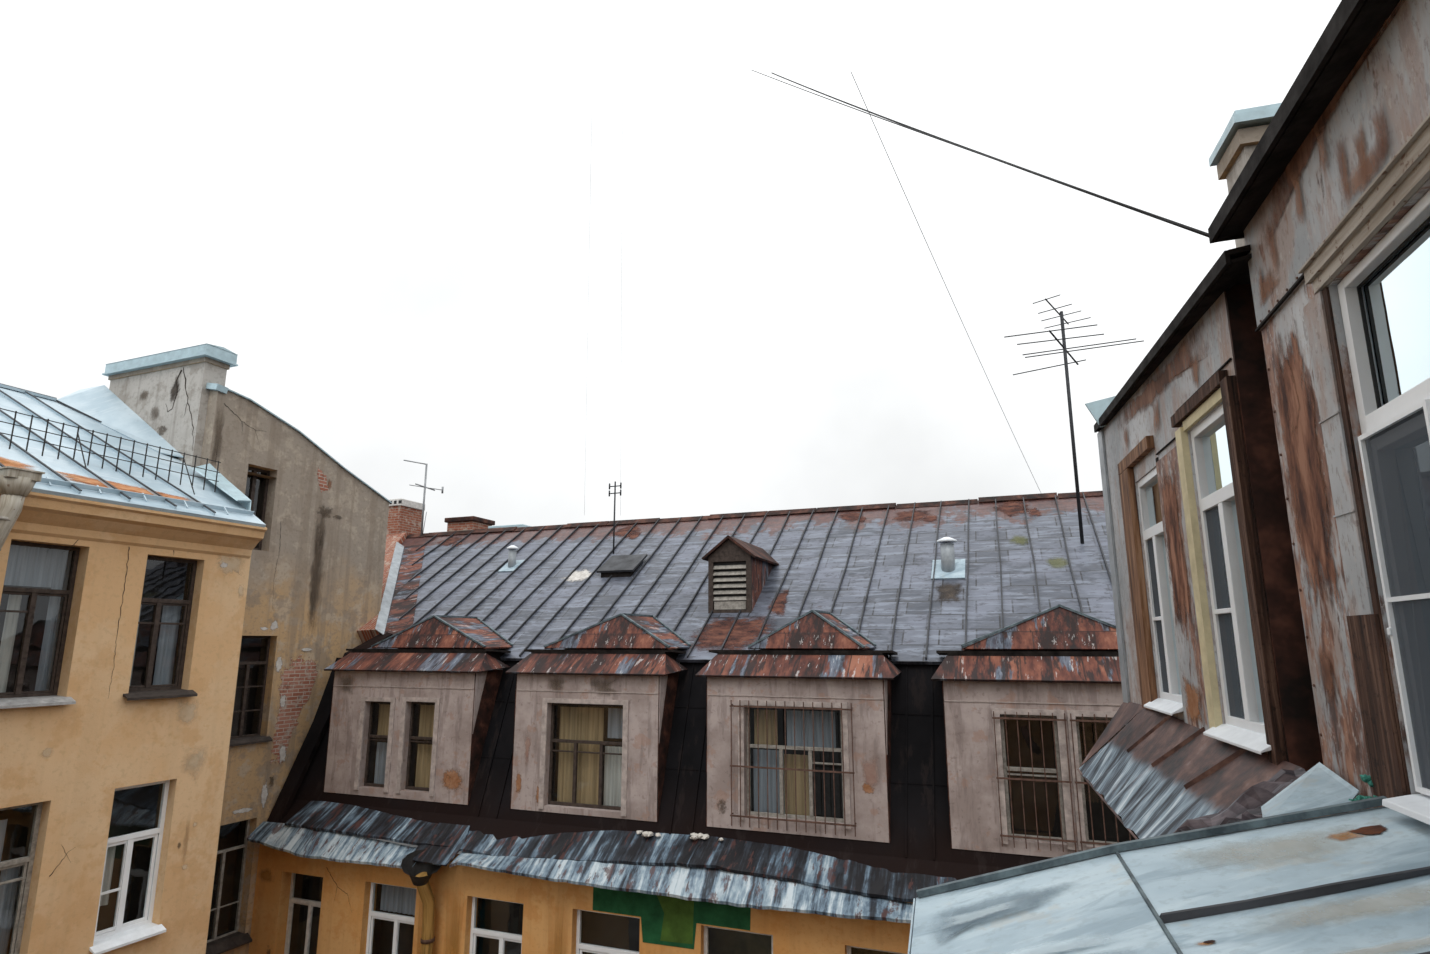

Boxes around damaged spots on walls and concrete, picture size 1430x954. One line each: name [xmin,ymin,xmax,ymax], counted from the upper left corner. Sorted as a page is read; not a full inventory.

rust [1259,7,1397,301]
crack [166,367,194,449]
rust [1161,471,1191,624]
rust [688,590,789,650]
flaking render [233,648,318,814]
rust [1183,678,1201,721]
rust [1331,825,1387,840]